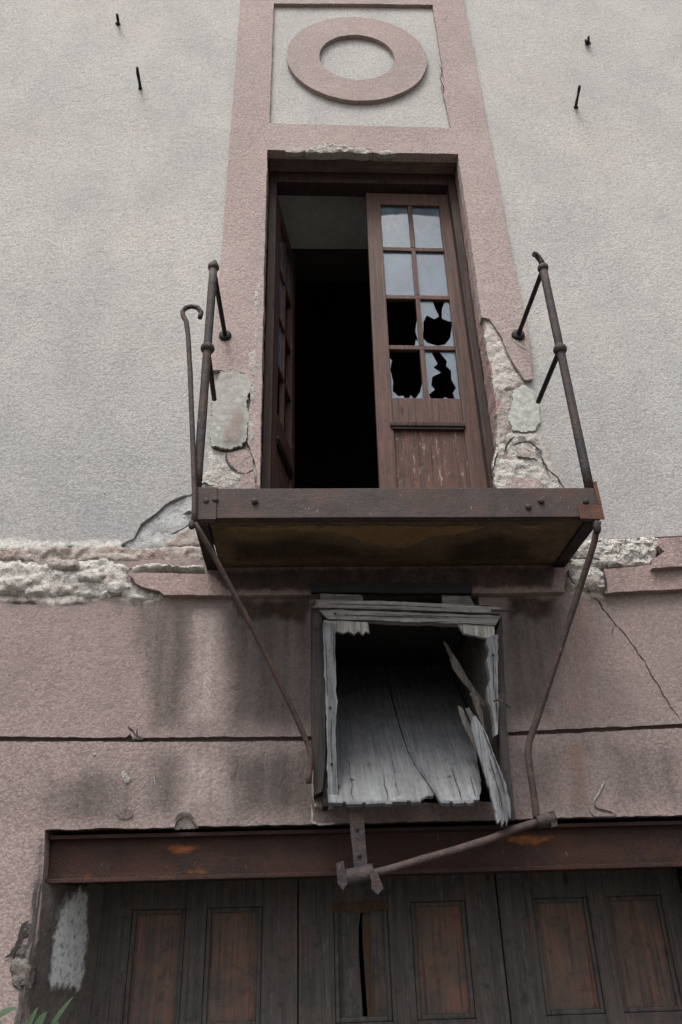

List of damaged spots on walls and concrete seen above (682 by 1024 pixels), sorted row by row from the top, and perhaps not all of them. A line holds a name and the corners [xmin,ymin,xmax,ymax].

flaking render [202,281,261,489]
spalling [482,321,564,488]
spalling [0,494,205,604]
spalling [565,537,659,598]
crack [591,596,681,721]
rust [507,835,547,844]
peeling [5,888,88,991]